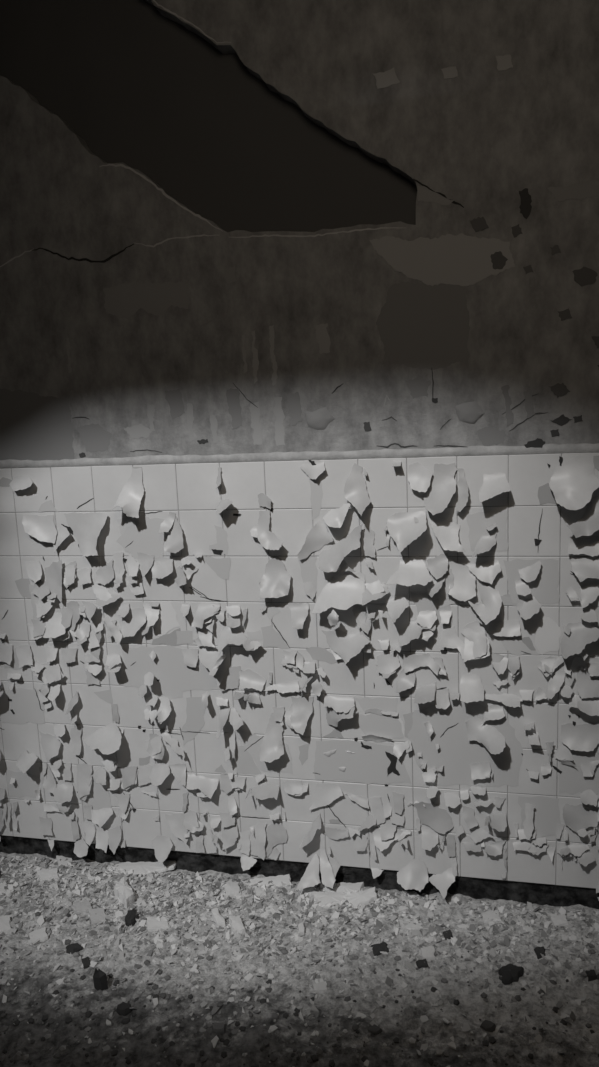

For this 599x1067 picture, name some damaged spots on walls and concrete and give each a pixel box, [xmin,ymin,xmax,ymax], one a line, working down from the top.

crack [0,164,398,267]
spalling [0,0,533,286]
peeling [0,455,599,899]